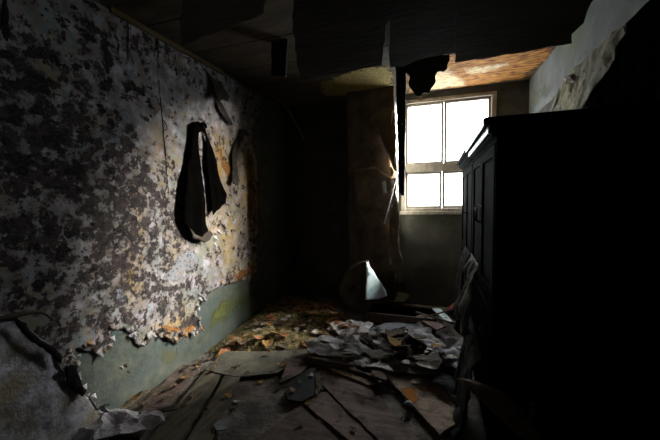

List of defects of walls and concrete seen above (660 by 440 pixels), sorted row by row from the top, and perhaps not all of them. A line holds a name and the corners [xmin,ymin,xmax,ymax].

damp [1,69,56,126]
damp [21,42,90,72]
damp [57,16,155,118]
peeling [431,68,466,89]
peeling [464,63,509,73]
damp [49,228,102,278]
peeling [84,291,207,357]